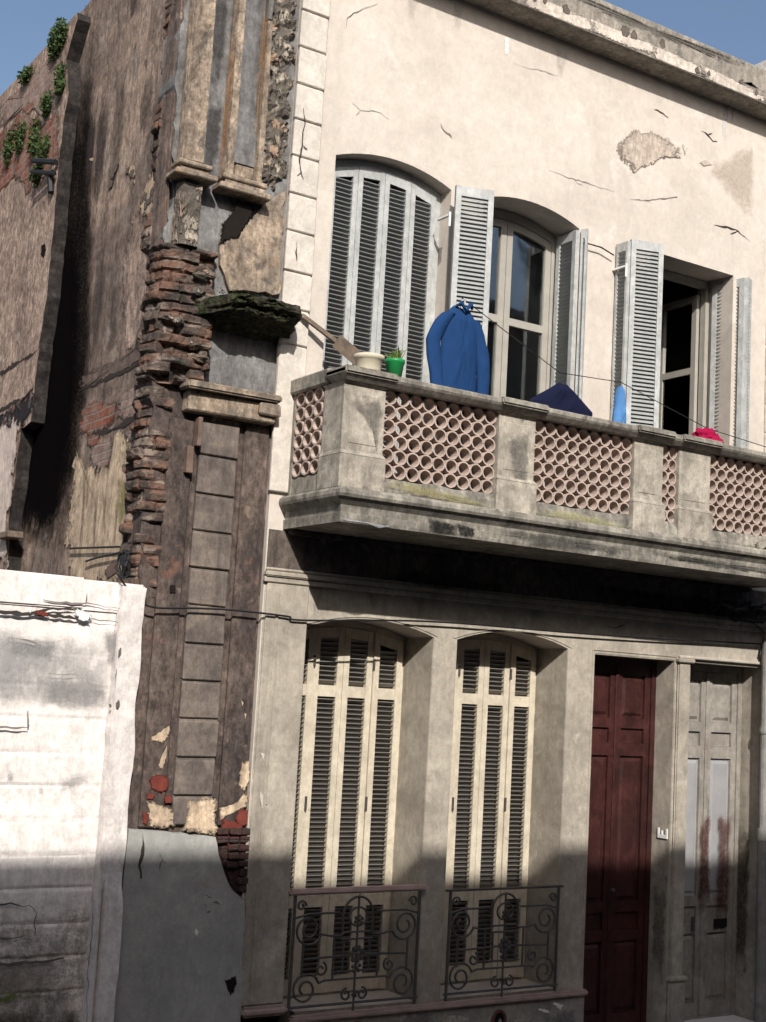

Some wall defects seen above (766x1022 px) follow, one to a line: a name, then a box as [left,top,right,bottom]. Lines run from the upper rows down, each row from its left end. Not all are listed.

spalling [163,0,171,39]
peeling [516,0,766,102]
peeling [616,129,687,173]
spalling [77,97,256,598]
spalling [142,726,268,896]